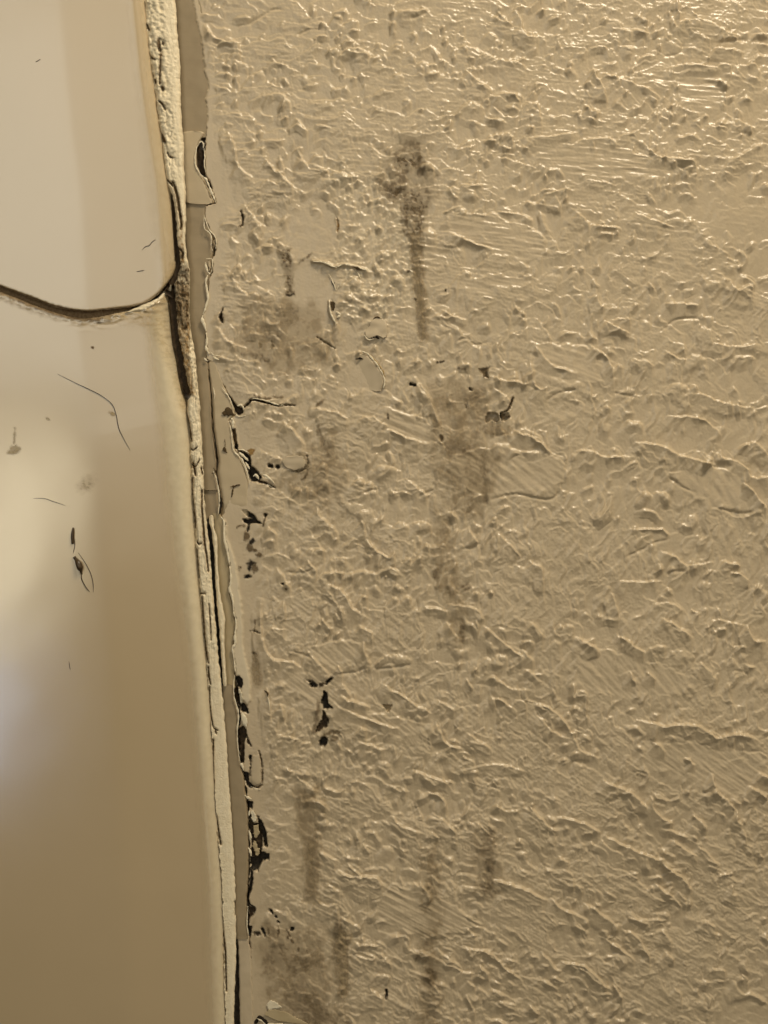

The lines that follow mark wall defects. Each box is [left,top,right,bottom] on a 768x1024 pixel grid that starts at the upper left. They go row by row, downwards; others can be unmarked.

spalling [194,141,216,203]
peeling [200,217,220,361]
damp [387,144,427,339]
spalling [213,388,282,497]
spalling [220,517,269,936]